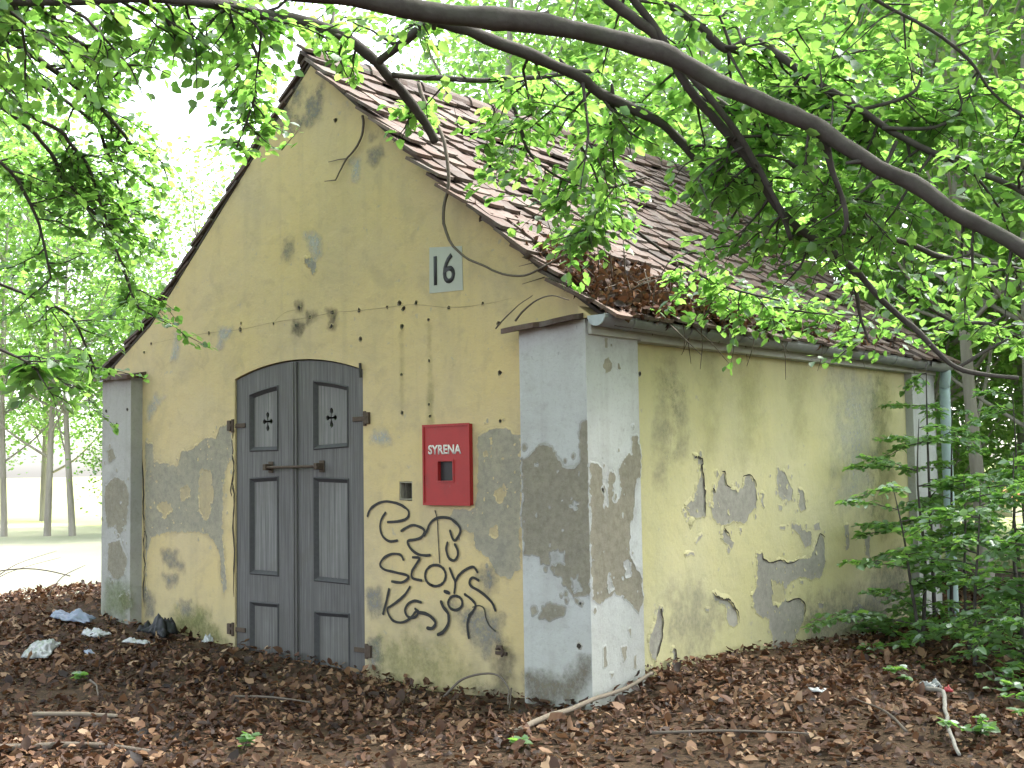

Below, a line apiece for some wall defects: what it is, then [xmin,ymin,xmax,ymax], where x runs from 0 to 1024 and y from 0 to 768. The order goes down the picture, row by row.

peeling [101,443,132,617]
peeling [142,423,234,601]
peeling [449,417,644,622]
peeling [681,449,826,649]
peeling [602,605,678,679]